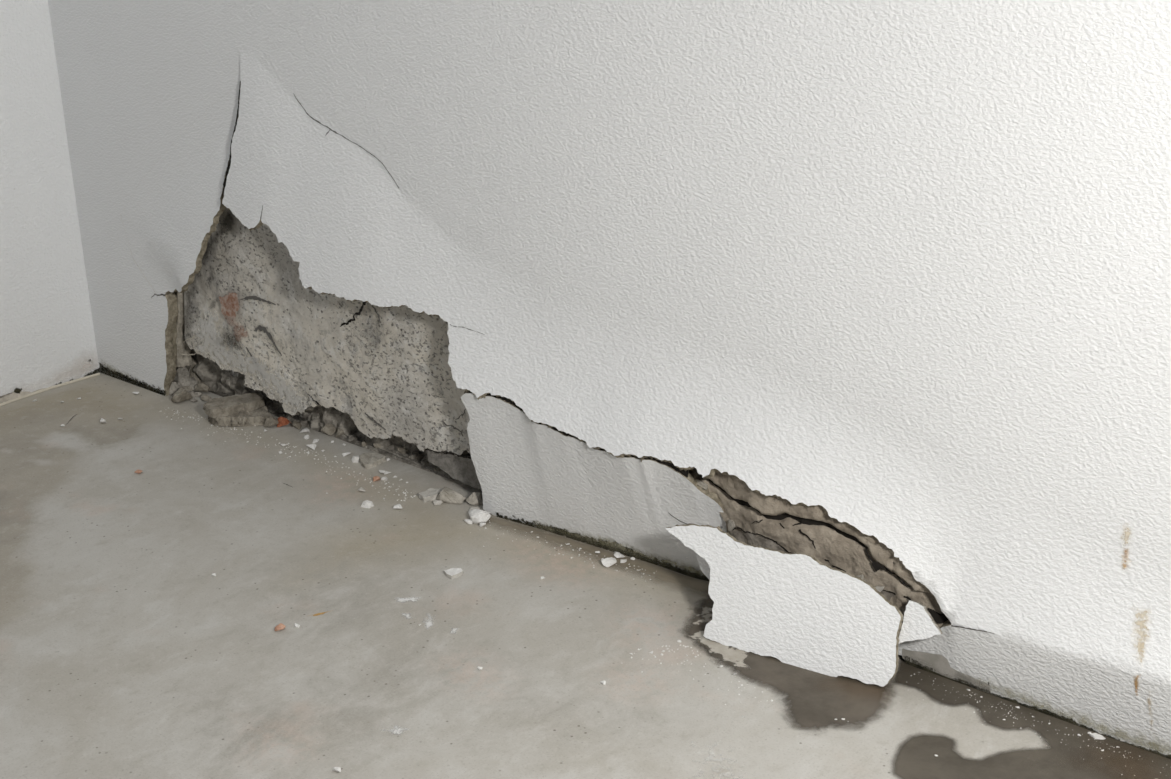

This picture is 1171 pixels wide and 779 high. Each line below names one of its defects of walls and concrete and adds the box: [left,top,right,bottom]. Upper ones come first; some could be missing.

crack [223,81,241,195]
crack [293,93,399,188]
spalling [160,207,482,491]
spalling [601,552,626,567]
water stain [487,513,1171,779]
spalling [692,468,991,693]